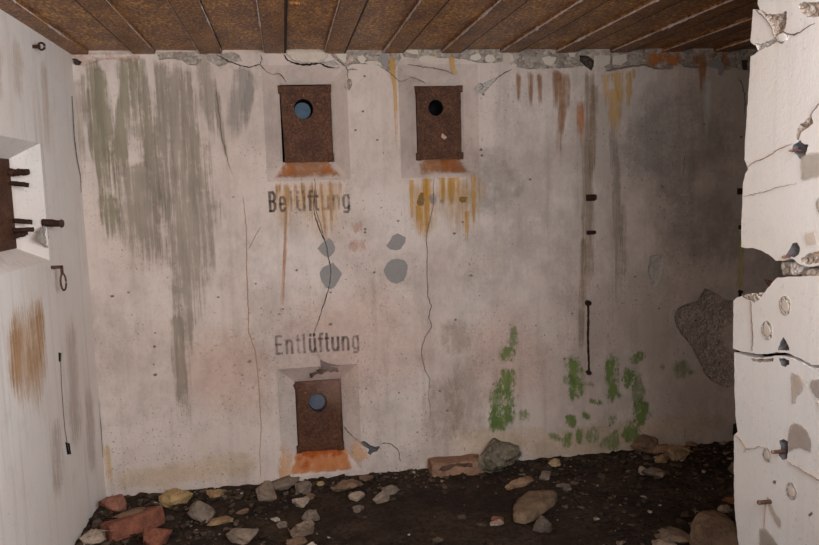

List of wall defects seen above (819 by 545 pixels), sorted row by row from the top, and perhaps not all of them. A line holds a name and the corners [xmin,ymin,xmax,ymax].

spalling [286,10,789,72]
spalling [798,2,819,18]
rust [554,72,569,133]
spalling [792,115,813,159]
rust [280,162,335,210]
rust [410,159,475,232]
leakage [87,59,254,399]
crack [313,179,331,356]
spalling [786,242,819,265]
crack [421,183,434,418]
spalling [674,288,735,388]
rust [279,443,366,478]